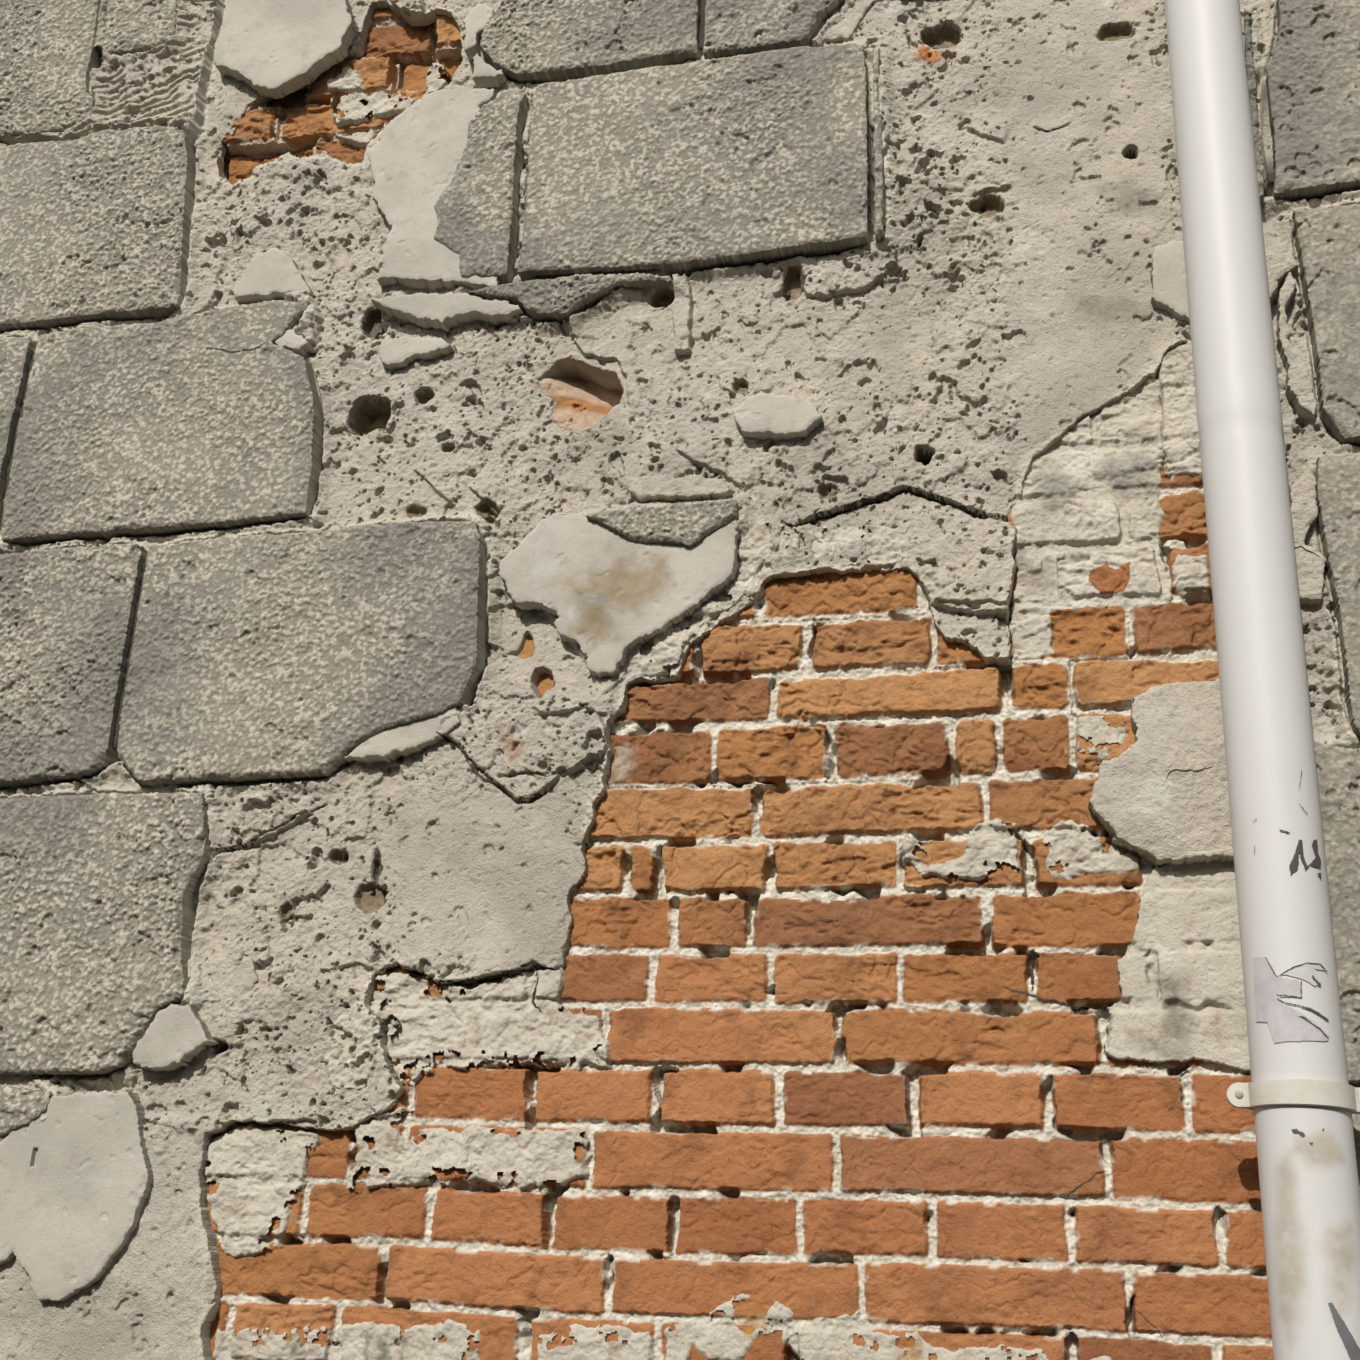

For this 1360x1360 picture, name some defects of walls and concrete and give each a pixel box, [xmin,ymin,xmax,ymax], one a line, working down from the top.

spalling [214,0,542,291]
spalling [1239,0,1360,750]
peeling [738,522,775,566]
crack [782,486,1011,541]
peeling [499,512,741,678]
peeling [344,706,461,764]
peeling [197,955,260,1023]
peeling [208,1017,243,1039]
peeling [324,1014,380,1090]
peeling [213,1319,480,1360]
peeling [537,1324,657,1360]
peeling [664,1293,1048,1360]